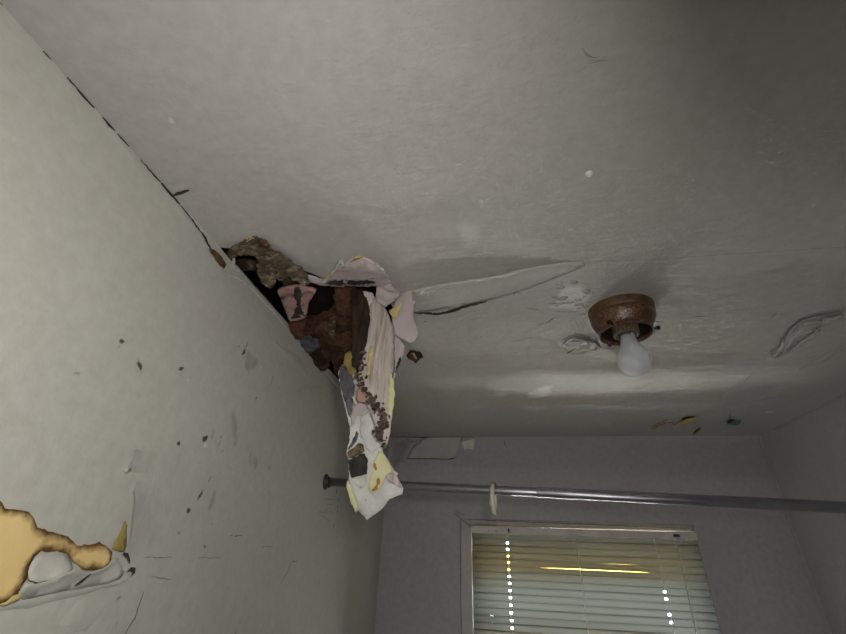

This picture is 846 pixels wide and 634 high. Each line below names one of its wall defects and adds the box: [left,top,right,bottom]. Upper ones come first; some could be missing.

crack [67,77,211,248]
peeling [389,290,423,380]
peeling [537,276,597,336]